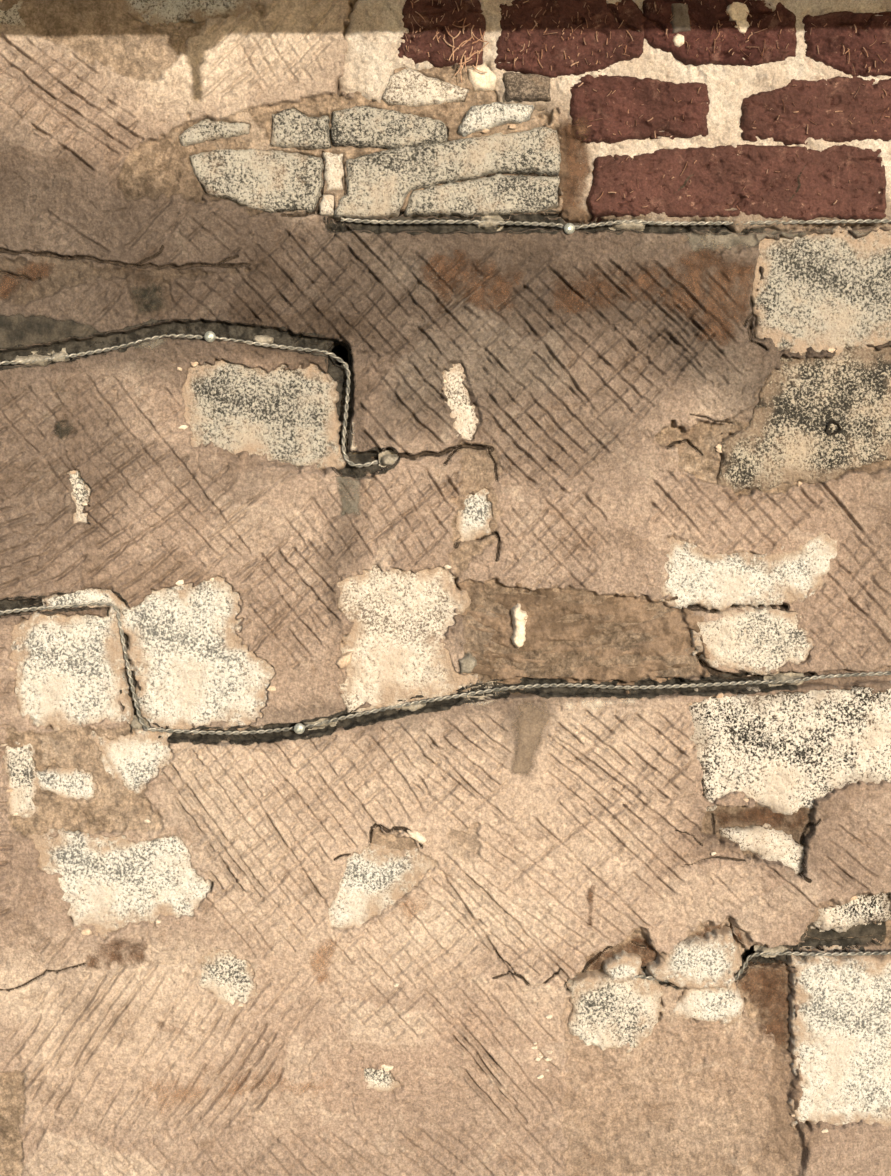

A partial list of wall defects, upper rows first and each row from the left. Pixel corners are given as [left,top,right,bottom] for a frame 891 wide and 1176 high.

spalling [179,63,561,220]
spalling [177,359,349,470]
crack [371,444,498,482]
spalling [715,225,891,493]
spalling [0,576,276,818]
spalling [337,565,478,715]
crack [696,654,818,680]
spalling [659,531,891,874]
spalling [31,828,213,938]
crack [492,941,646,986]
spalling [566,926,745,1054]
spalling [782,892,891,1133]